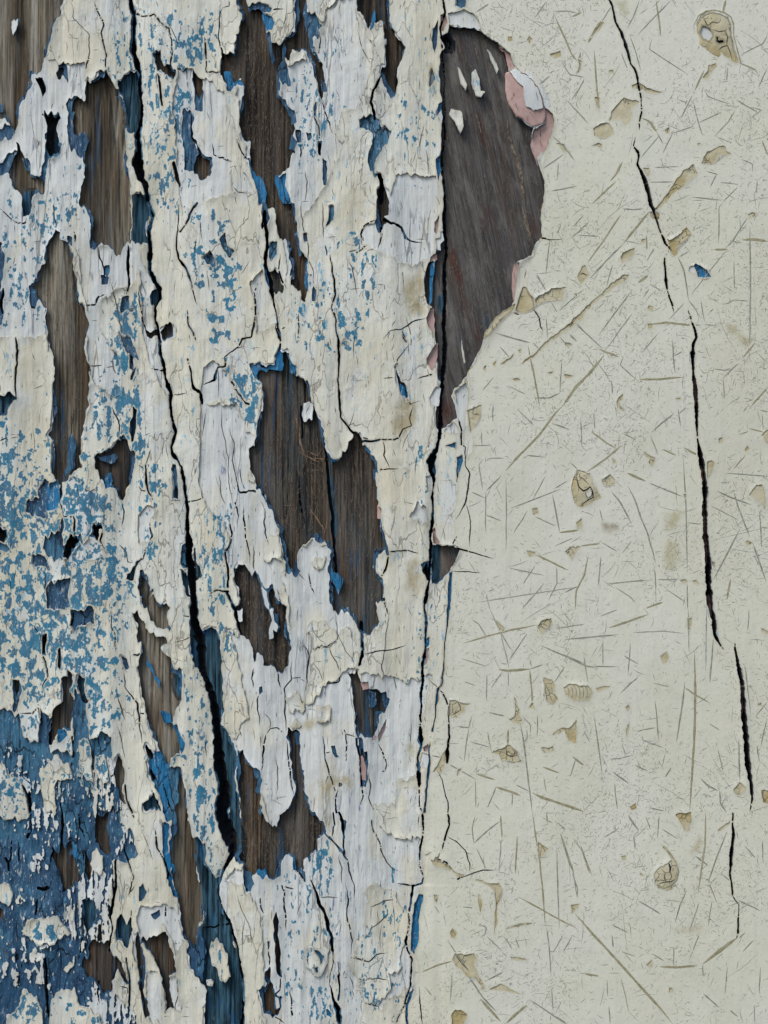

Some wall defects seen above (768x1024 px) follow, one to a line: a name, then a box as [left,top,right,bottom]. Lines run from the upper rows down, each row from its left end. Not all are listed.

crack [1,134,85,273]
peeling [0,0,173,631]
peeling [0,346,469,1024]
crack [48,0,428,1024]
peeling [154,0,646,478]
crack [342,0,768,1024]
peeling [571,458,616,530]
peeling [640,846,679,891]
peeling [694,9,750,79]